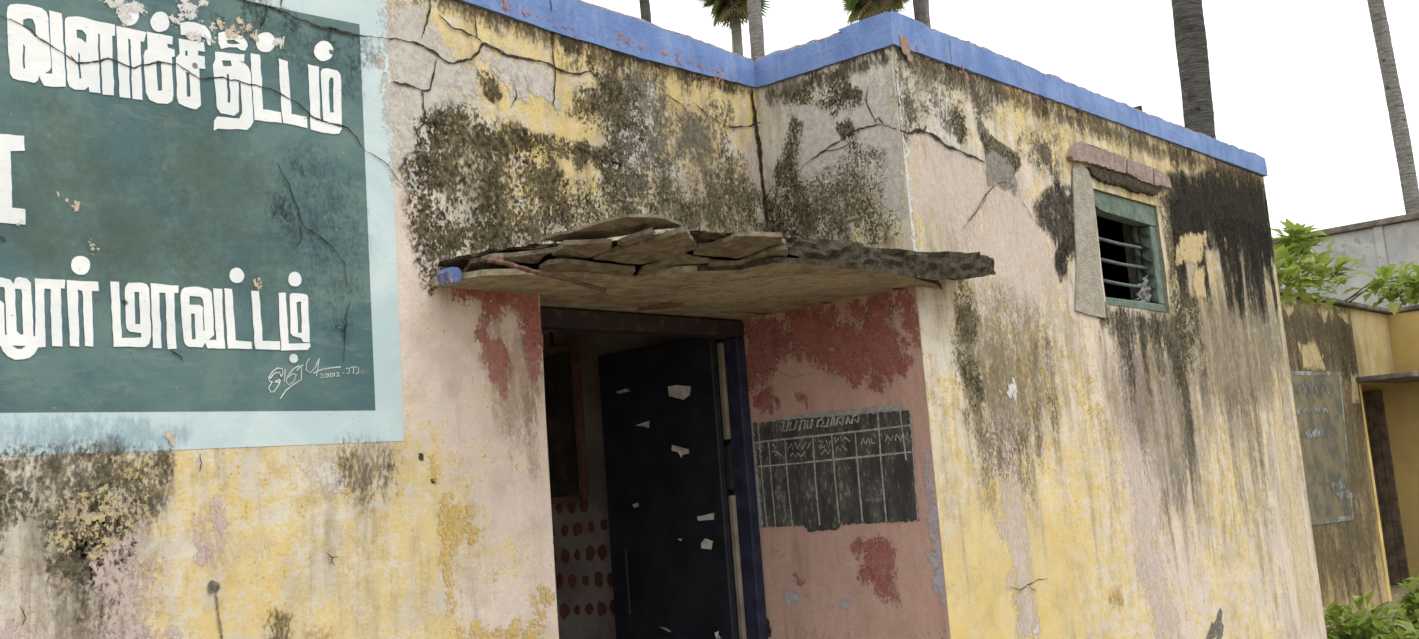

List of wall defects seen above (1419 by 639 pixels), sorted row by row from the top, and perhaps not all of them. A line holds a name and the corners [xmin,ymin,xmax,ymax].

peeling [103,0,148,28]
peeling [168,0,287,49]
crack [650,81,760,128]
water stain [399,35,1081,296]
crack [793,67,1040,227]
peeling [787,34,1076,324]
spalling [436,214,788,402]
peeling [743,288,921,415]
water stain [954,280,1059,497]
water stain [1100,142,1381,611]
water stain [0,421,177,637]
peeling [850,534,902,604]